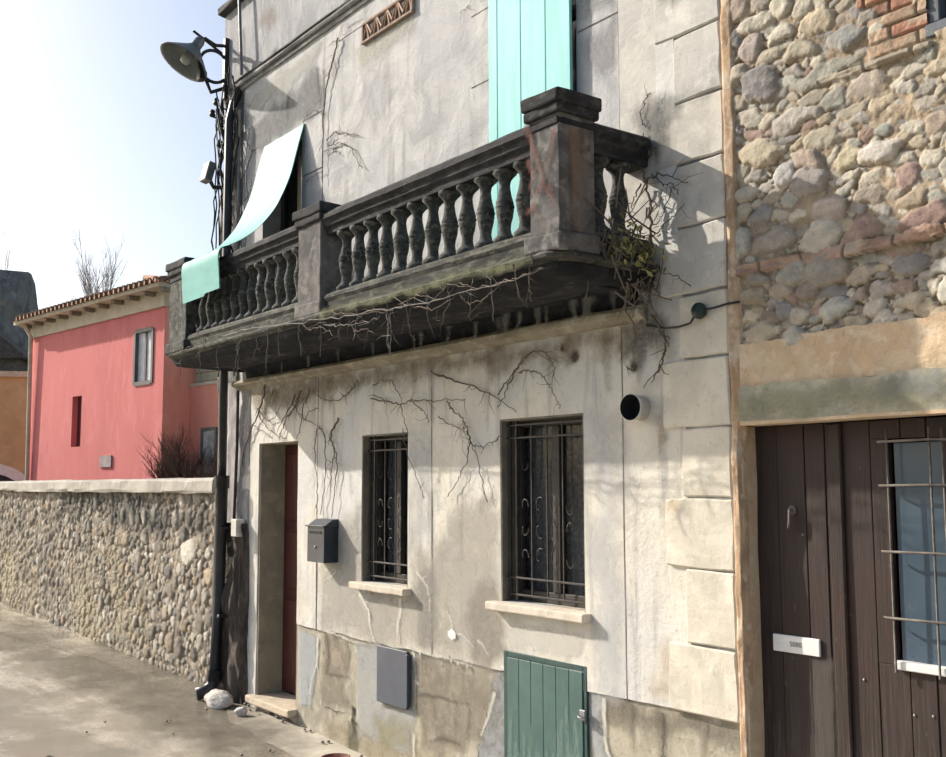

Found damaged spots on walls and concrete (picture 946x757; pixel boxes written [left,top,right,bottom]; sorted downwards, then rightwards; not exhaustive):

rust [524,124,553,212]
water stain [323,502,502,665]
crack [602,698,611,757]
crack [659,713,667,757]